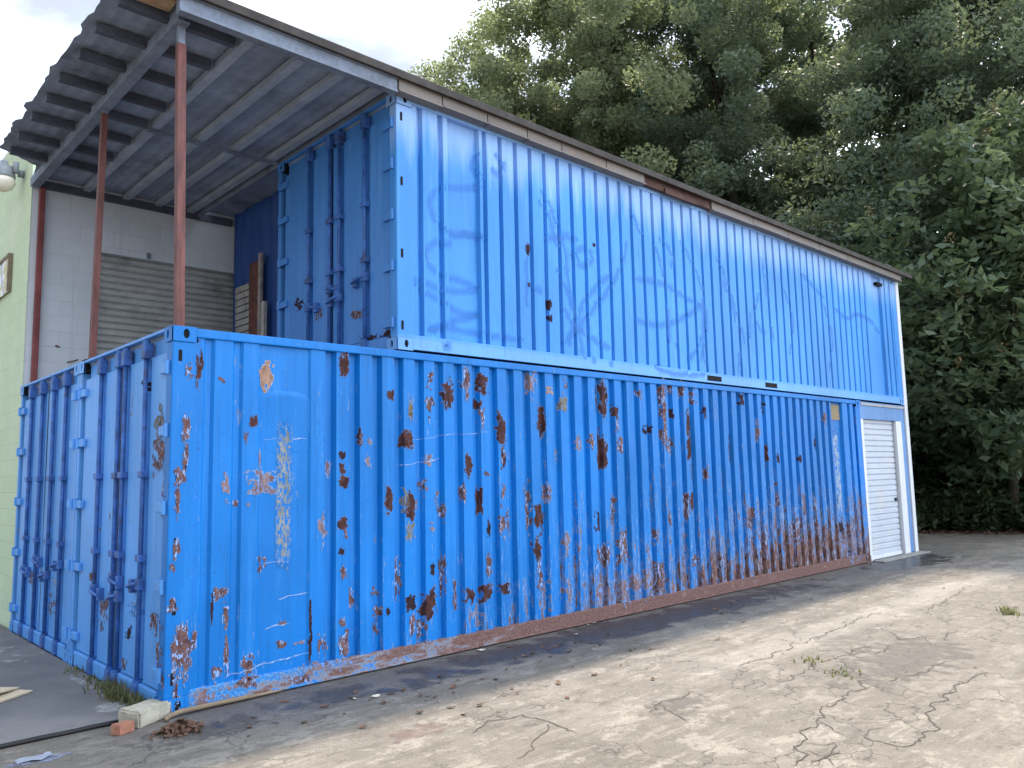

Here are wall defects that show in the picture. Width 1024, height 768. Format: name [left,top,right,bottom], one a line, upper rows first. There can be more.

rust [141,380,191,521]
peeling [259,360,275,393]
peeling [243,421,292,570]
rust [397,366,509,540]
rust [586,378,624,475]
rust [149,595,197,708]
rust [210,587,259,689]
rust [290,515,355,685]
rust [371,553,510,645]
crack [470,714,575,759]
crack [644,691,695,721]
crack [741,613,987,766]